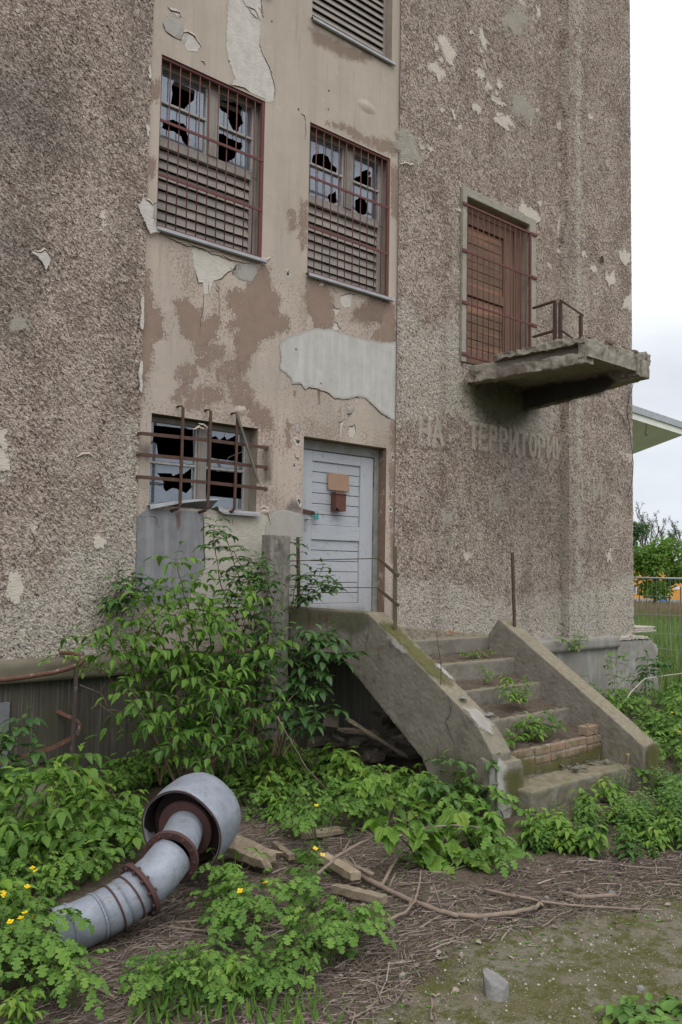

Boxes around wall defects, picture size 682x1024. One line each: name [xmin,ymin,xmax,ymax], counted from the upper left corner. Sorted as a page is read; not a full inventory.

flaking render [165,29,202,52]
flaking render [226,0,276,102]
flaking render [427,34,457,83]
flaking render [469,28,540,131]
flaking render [32,248,51,269]
flaking render [191,248,236,295]
flaking render [333,291,355,330]
spalling [460,695,494,734]